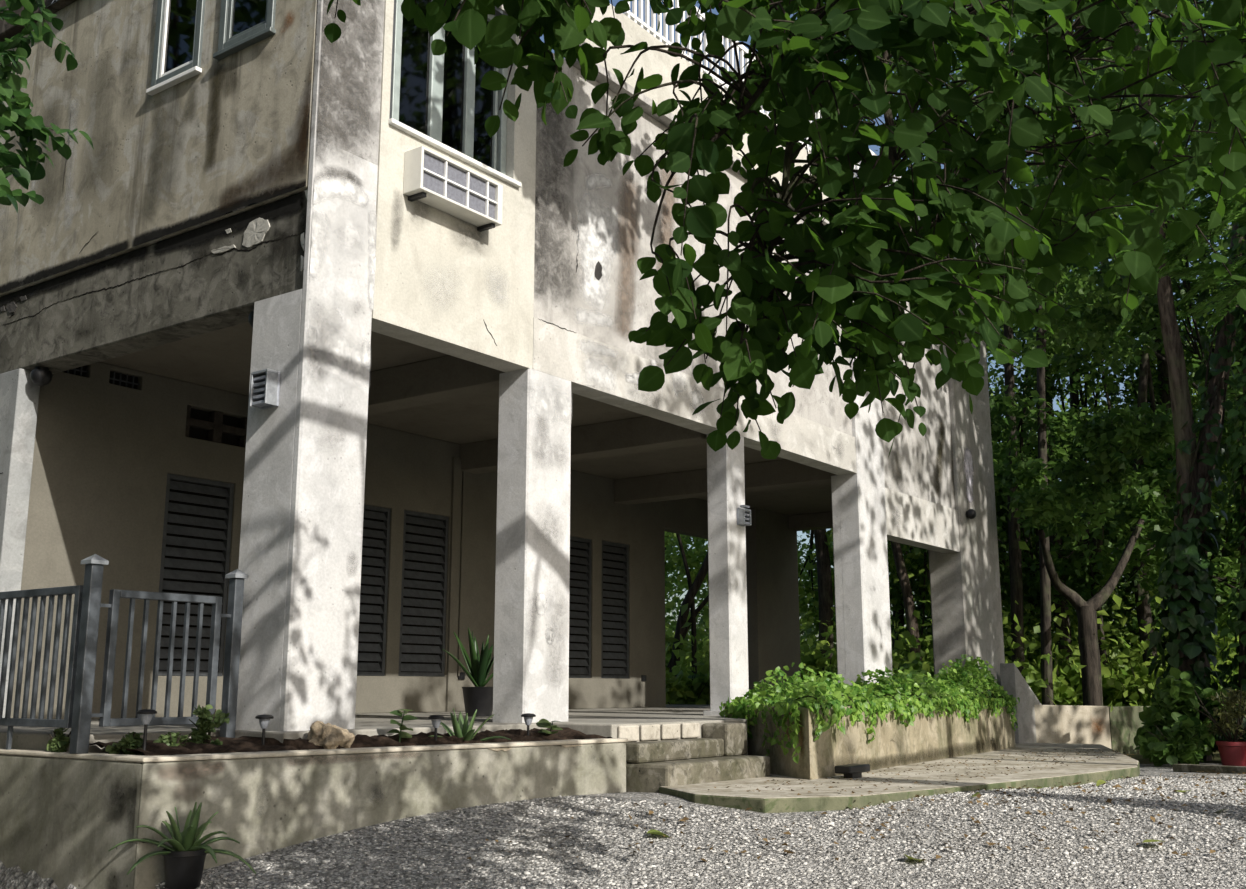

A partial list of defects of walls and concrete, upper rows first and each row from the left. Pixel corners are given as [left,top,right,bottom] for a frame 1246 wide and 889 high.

crack [3,234,300,325]
damp [0,0,377,307]
spalling [211,218,270,254]
damp [534,102,573,295]
damp [618,178,637,335]
damp [935,420,955,496]